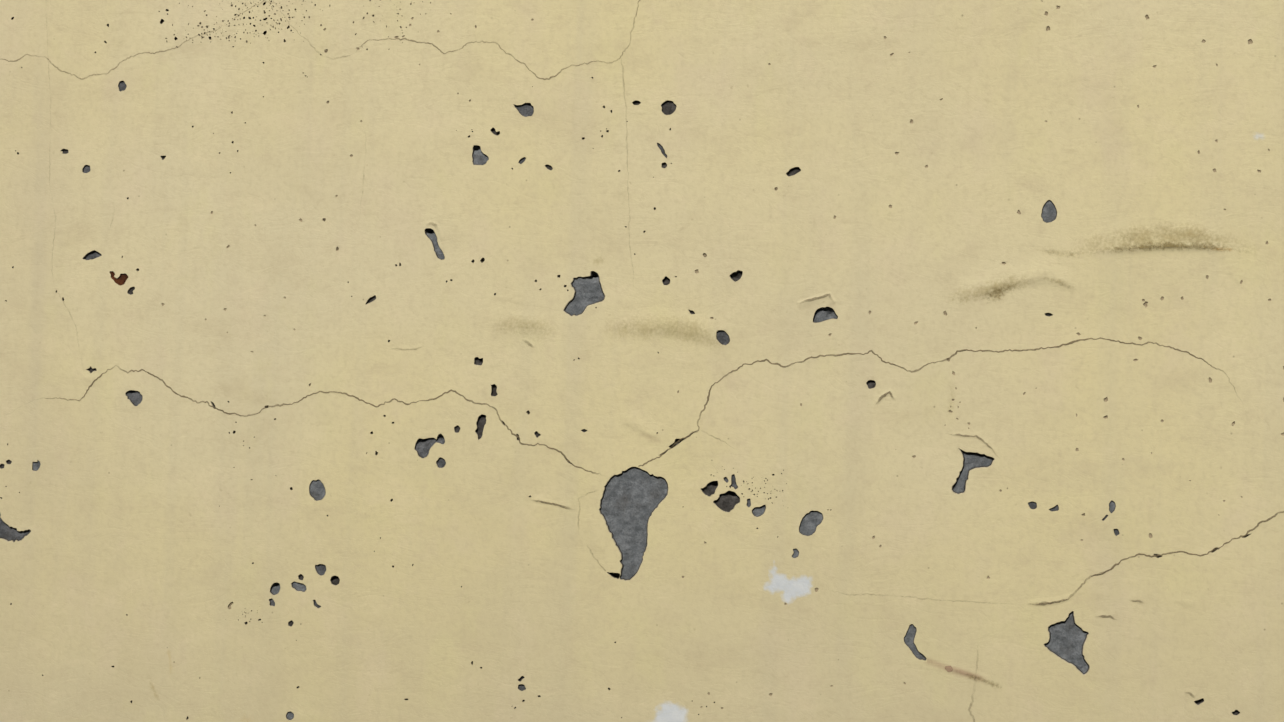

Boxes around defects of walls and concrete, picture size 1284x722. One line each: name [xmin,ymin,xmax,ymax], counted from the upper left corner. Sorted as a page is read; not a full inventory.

spalling [557,271,605,316]
crack [78,369,592,473]
crack [638,337,1212,467]
spalling [952,448,995,494]
spalling [0,486,31,542]
spalling [599,467,668,581]
crack [1081,514,1277,587]
spalling [904,624,927,661]
spalling [1044,611,1090,675]